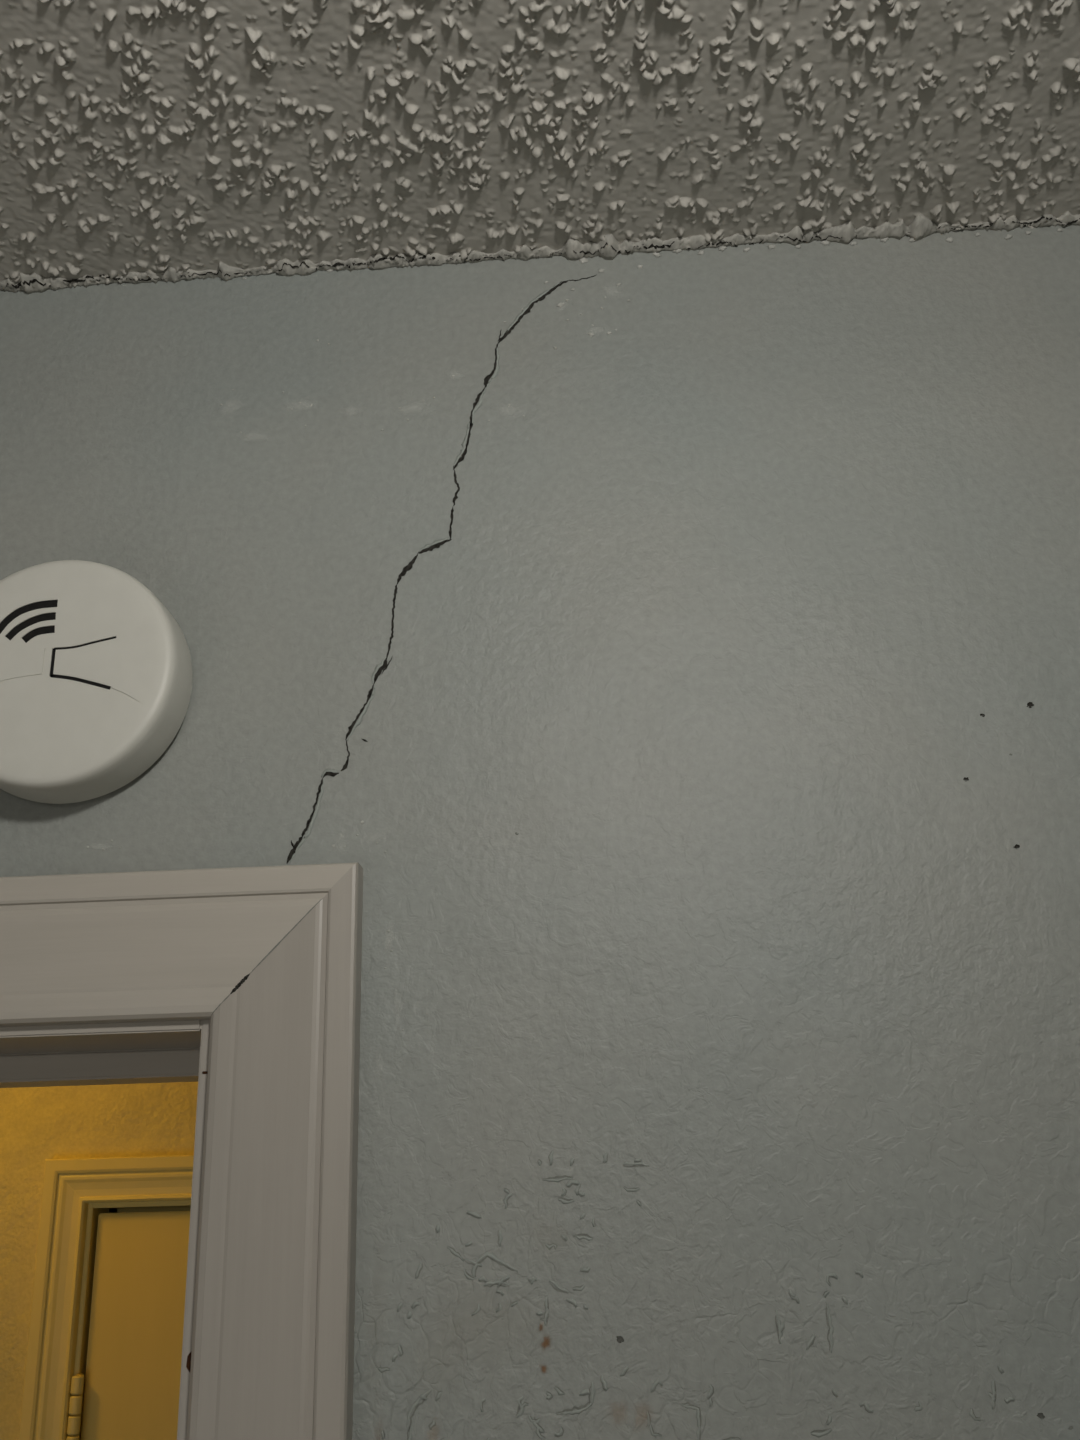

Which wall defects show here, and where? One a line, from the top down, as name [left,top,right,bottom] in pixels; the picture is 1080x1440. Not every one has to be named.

crack [287,235,840,865]